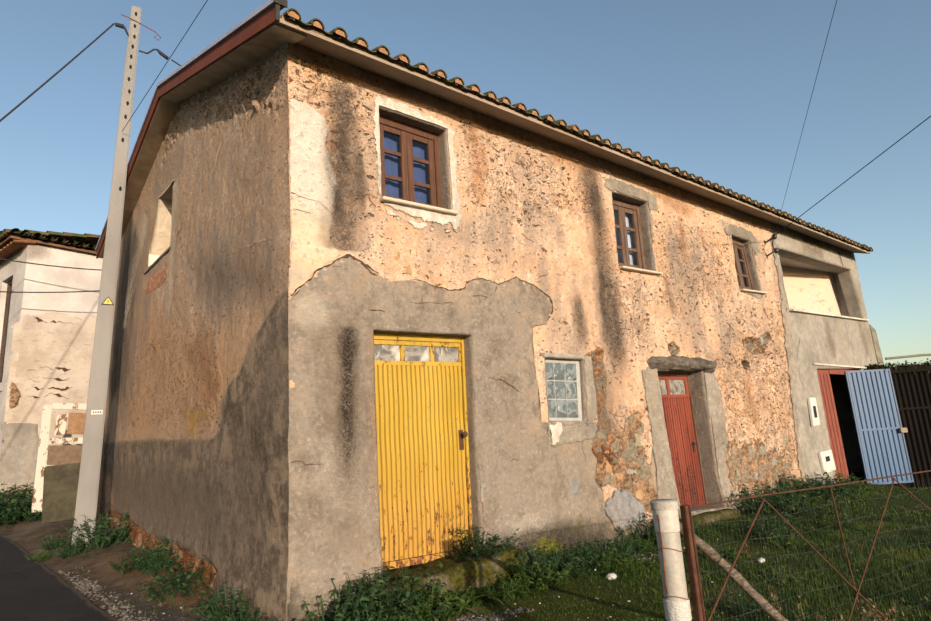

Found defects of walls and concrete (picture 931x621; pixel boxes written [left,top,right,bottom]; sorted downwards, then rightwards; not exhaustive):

peeling [4,310,97,446]
leakage [327,83,365,250]
leakage [341,327,354,462]
peeling [386,207,434,231]
peeling [548,422,563,445]
leakage [576,299,585,336]
leakage [584,167,623,366]
spalling [591,347,658,513]
spalling [741,331,772,370]
spalling [98,509,217,592]